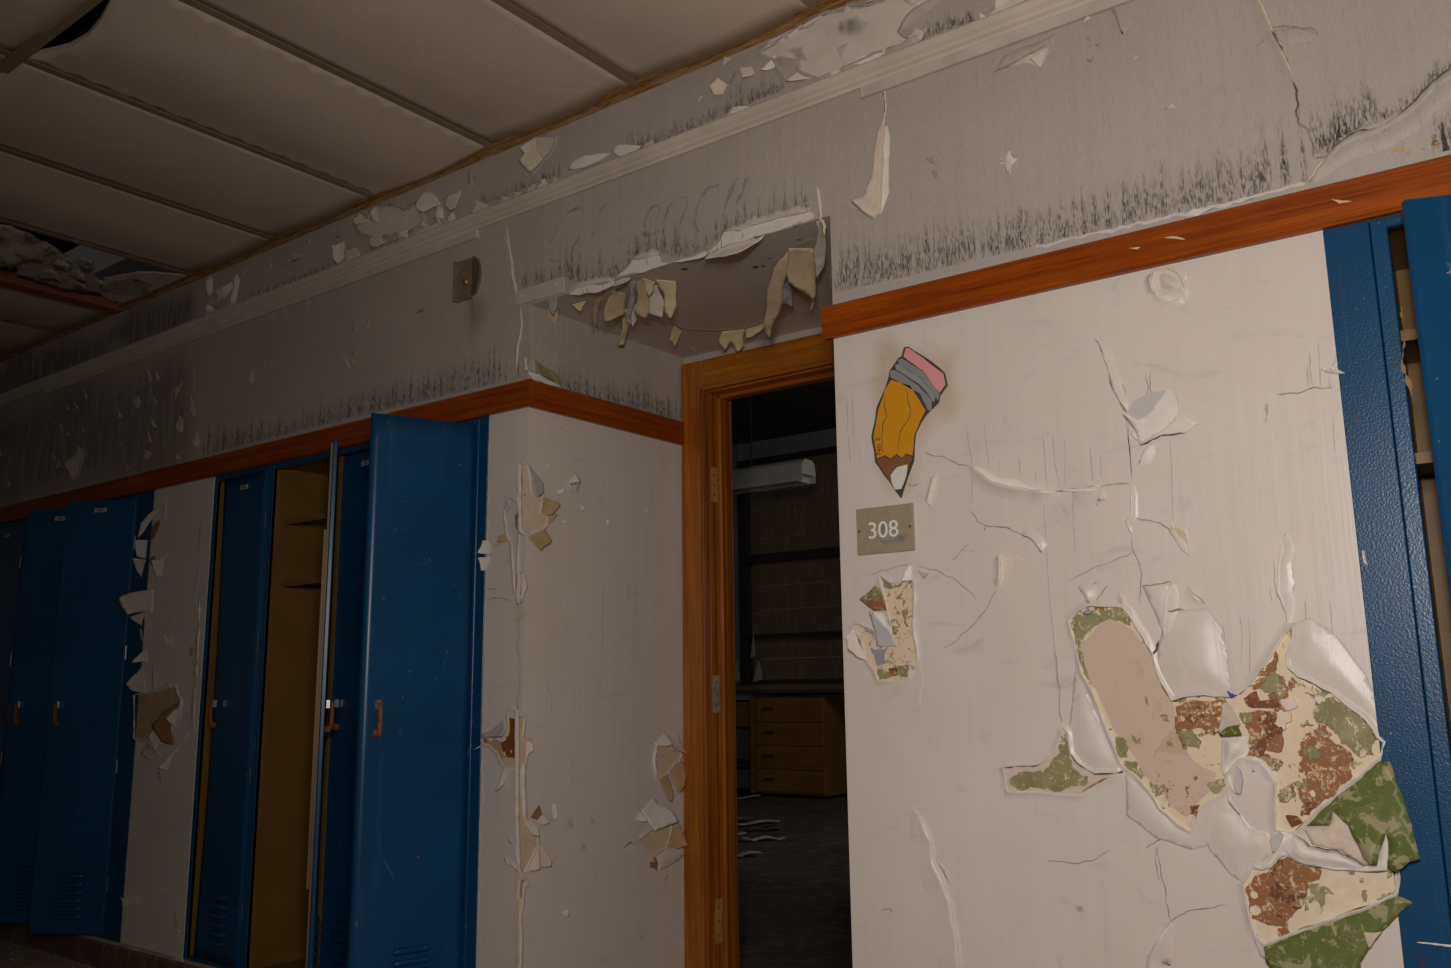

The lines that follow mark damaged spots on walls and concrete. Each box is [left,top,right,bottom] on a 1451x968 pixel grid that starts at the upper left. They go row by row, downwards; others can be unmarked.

peeling [696,0,941,116]
crack [1247,0,1451,186]
peeling [331,133,653,265]
damp [829,106,1385,284]
peeling [547,206,826,360]
crack [1095,339,1151,413]
peeling [477,447,561,643]
peeling [846,554,1023,687]
crack [953,511,1048,560]
crack [1070,553,1131,605]
peeling [924,452,1400,968]
crack [1295,834,1363,866]